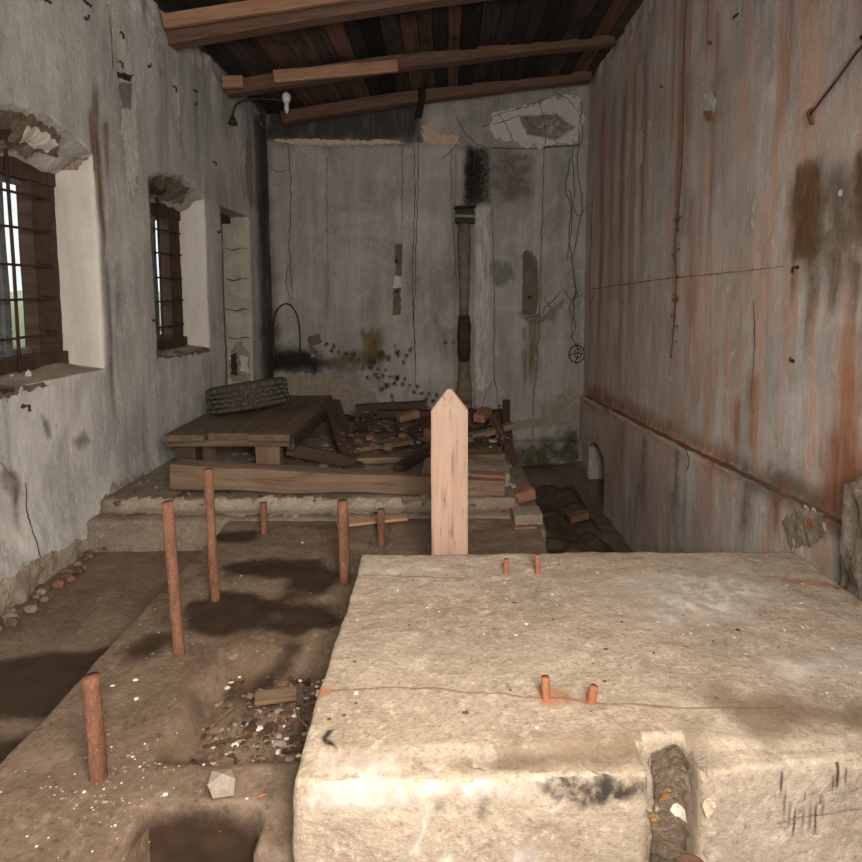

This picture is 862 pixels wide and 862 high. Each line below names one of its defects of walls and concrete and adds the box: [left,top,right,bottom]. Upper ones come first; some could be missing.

peeling [489,93,585,150]
water stain [793,154,862,260]
water stain [324,333,438,403]
corrosion [689,334,856,536]
crack [0,462,41,557]